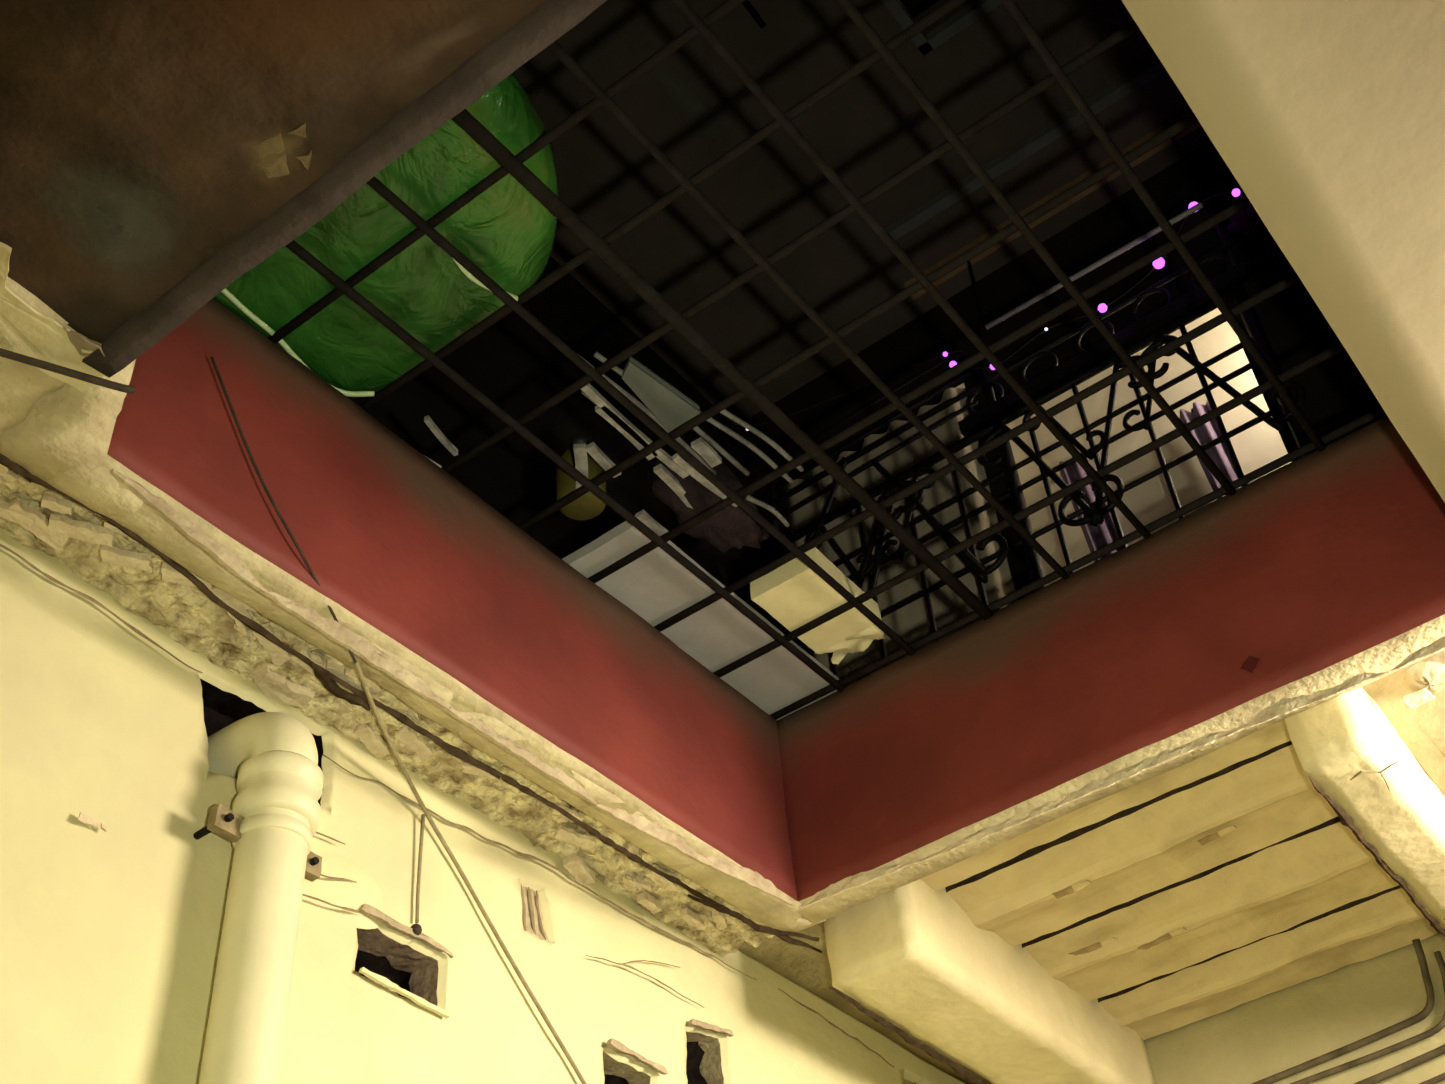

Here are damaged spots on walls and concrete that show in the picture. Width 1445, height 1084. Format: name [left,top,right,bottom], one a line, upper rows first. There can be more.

flaking render [0,464,1445,957]
spalling [355,904,454,1019]
spalling [603,1038,669,1084]
spalling [686,1019,734,1084]